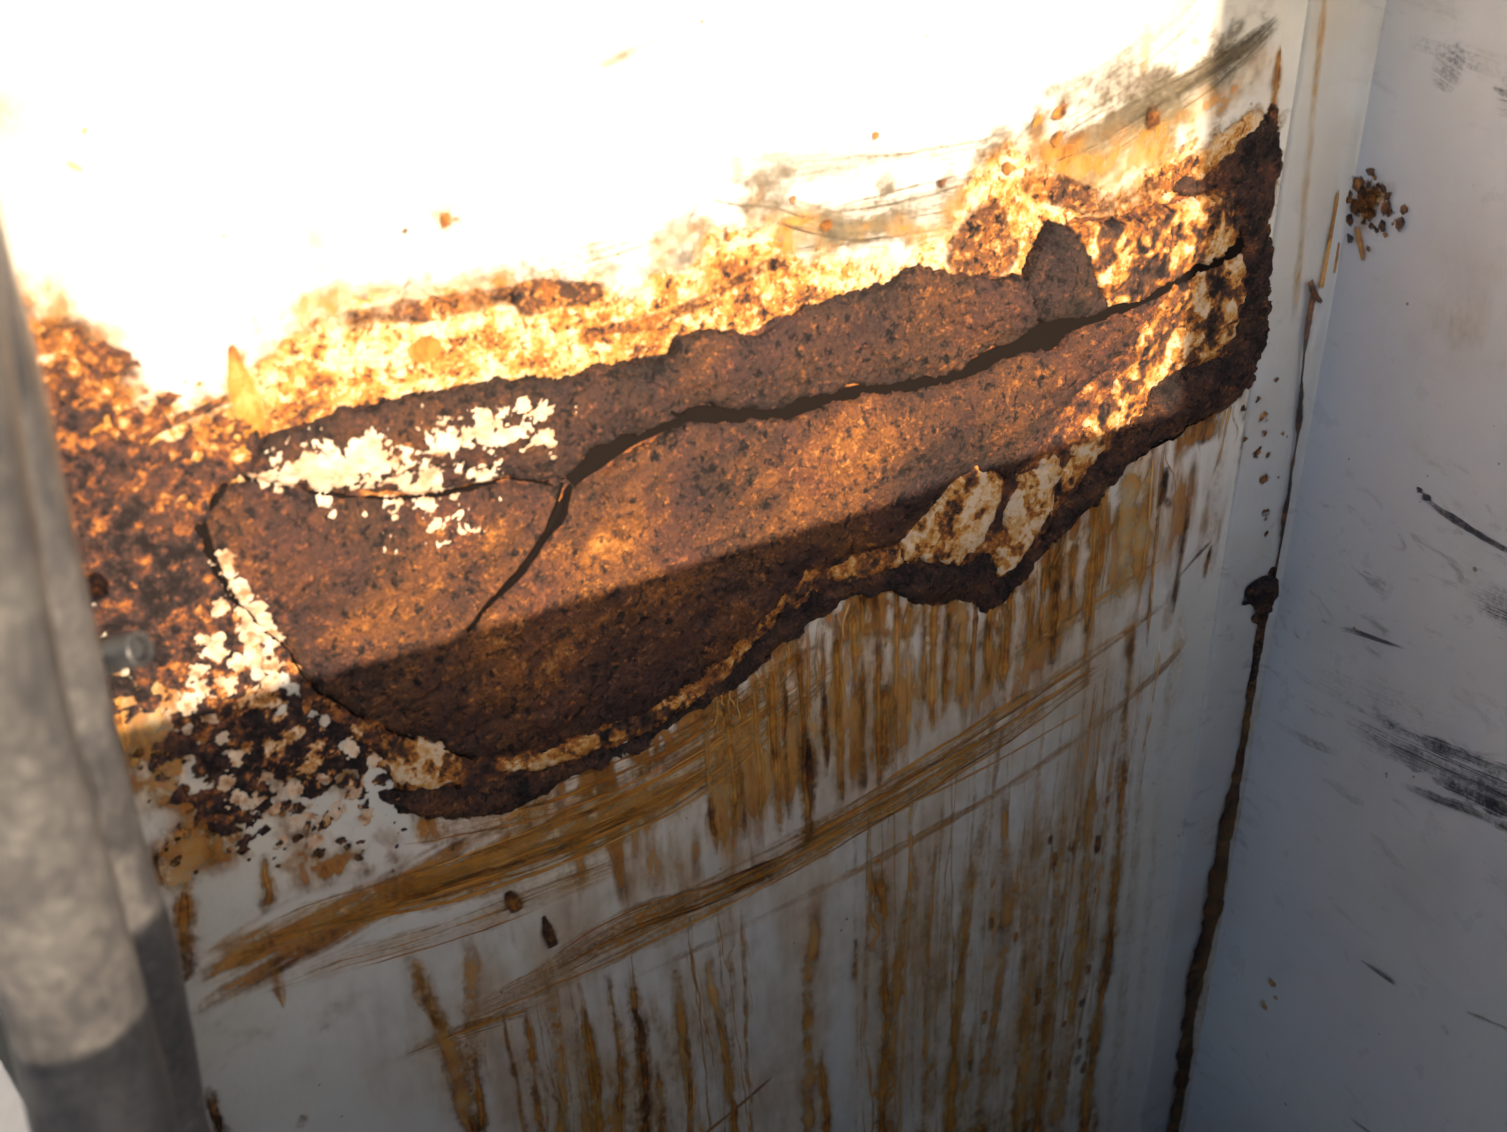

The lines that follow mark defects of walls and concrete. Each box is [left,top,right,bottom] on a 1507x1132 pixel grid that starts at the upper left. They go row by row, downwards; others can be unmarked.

rust [29,50,1283,1132]
crack [194,237,1245,760]